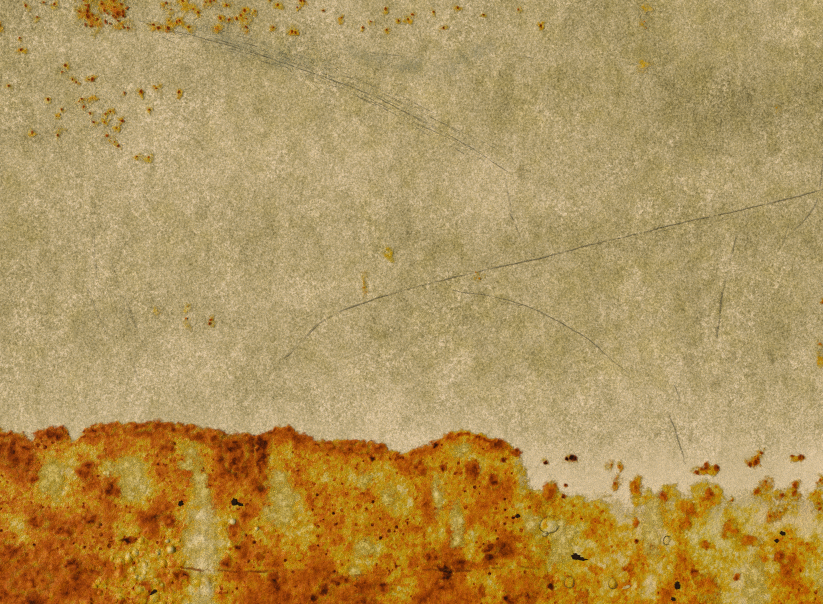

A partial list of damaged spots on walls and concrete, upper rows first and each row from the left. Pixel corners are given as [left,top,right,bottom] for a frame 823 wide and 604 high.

corrosion [77,0,135,33]
corrosion [147,0,257,34]
corrosion [382,7,417,34]
corrosion [61,62,98,85]
corrosion [75,95,124,149]
corrosion [0,419,823,604]